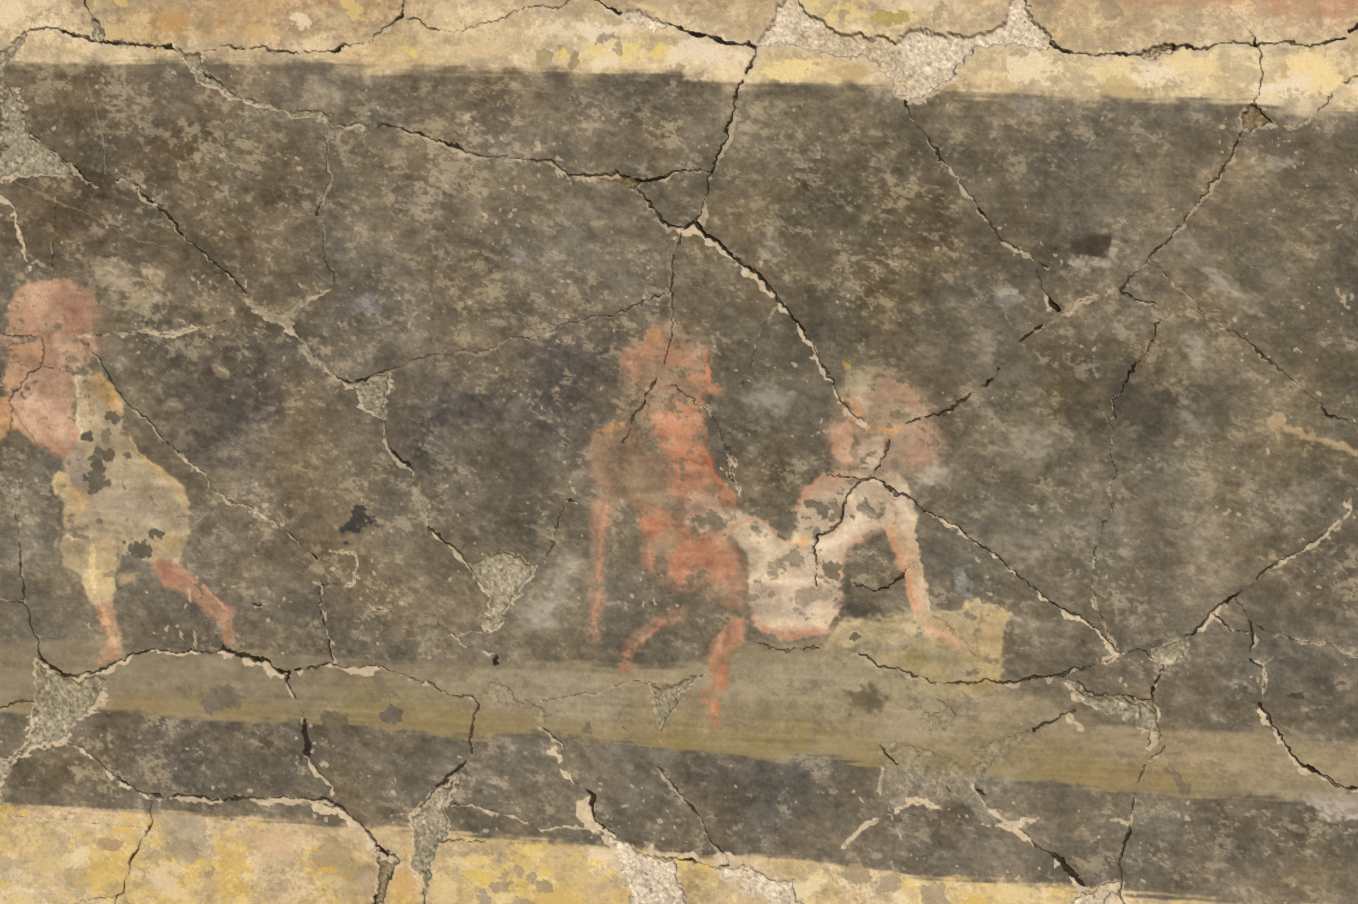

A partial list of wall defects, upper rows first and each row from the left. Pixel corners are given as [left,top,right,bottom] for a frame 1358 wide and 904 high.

crack [9,0,624,90]
spalling [757,0,1069,106]
spalling [0,31,83,184]
crack [305,0,1358,904]
crack [0,132,651,904]
spalling [468,552,539,634]
spalling [0,657,110,808]
spalling [601,835,688,904]
spalling [1070,878,1127,904]